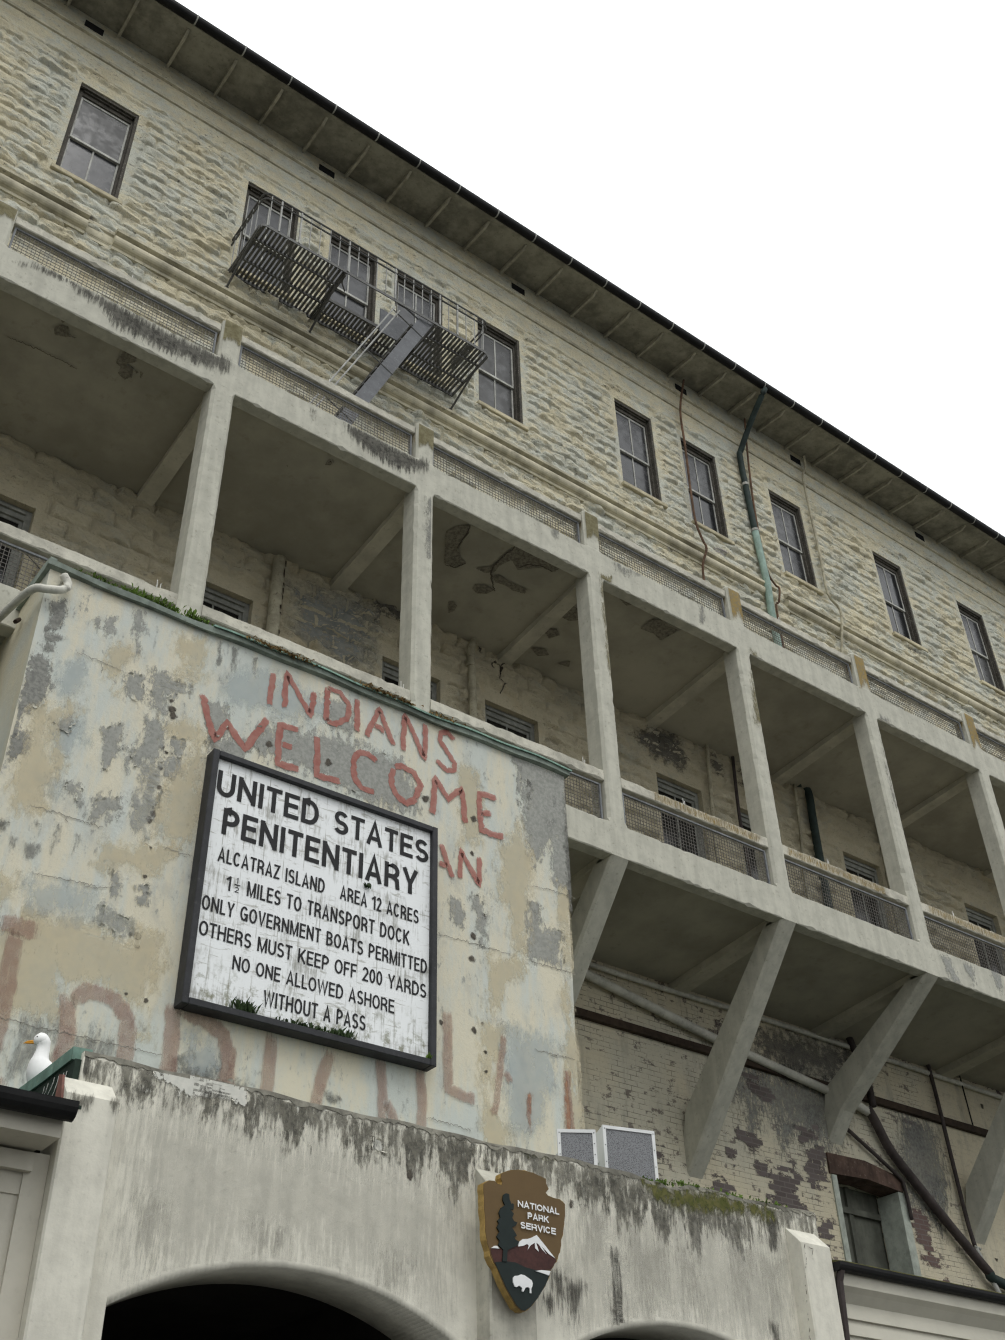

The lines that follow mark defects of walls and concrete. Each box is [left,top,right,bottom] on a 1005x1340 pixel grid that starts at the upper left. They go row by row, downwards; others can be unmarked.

water stain [22,263,230,374]
spalling [444,525,560,594]
peeling [6,598,77,760]
peeling [62,665,423,844]
peeling [92,868,151,937]
flaking render [741,1072,776,1107]
water stain [347,1118,373,1164]
water stain [405,1133,475,1203]
flaking render [711,1123,837,1248]
flaking render [911,1192,950,1282]